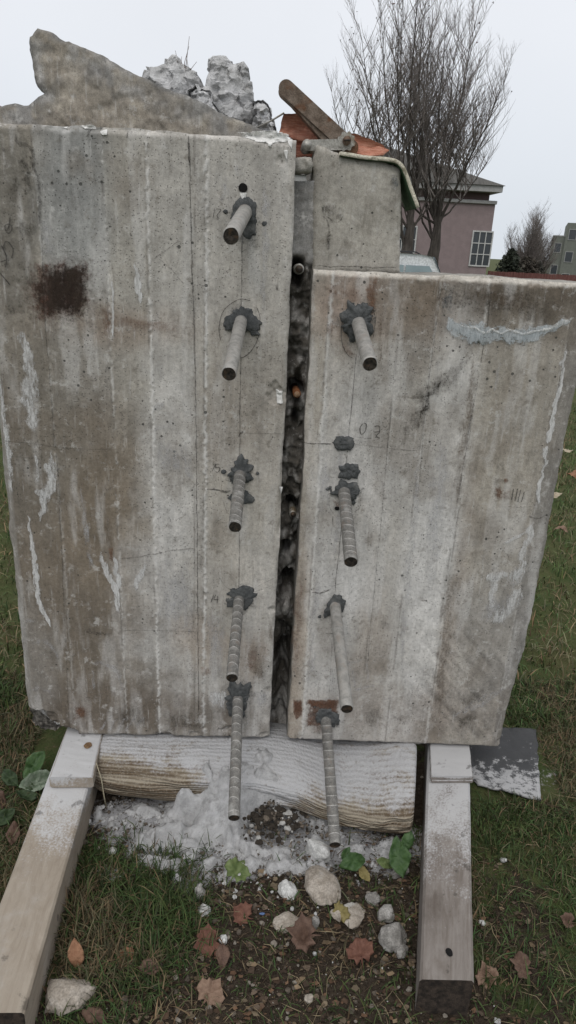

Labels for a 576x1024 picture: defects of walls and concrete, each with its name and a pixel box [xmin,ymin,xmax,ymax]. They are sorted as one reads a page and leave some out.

peeling [447,318,570,345]
damp [17,333,39,429]
damp [536,351,567,503]
damp [27,455,56,625]
damp [100,549,121,611]
rust [293,700,338,726]